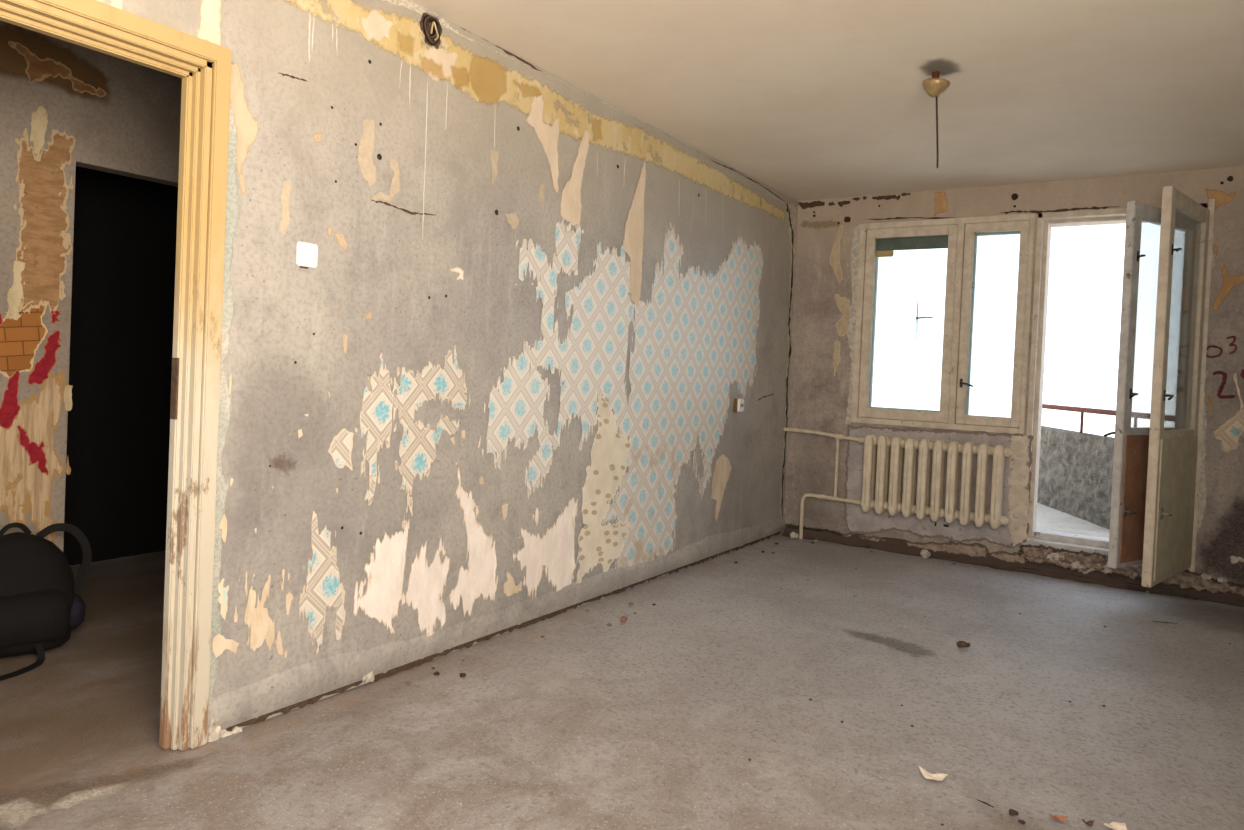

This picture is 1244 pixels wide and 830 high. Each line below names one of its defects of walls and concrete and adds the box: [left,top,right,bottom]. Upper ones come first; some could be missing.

peeling [423,47,458,82]
peeling [372,160,400,201]
peeling [209,105,239,700]
peeling [0,370,73,543]
peeling [1196,370,1214,535]
water stain [1200,501,1244,582]
spalling [1160,569,1244,597]